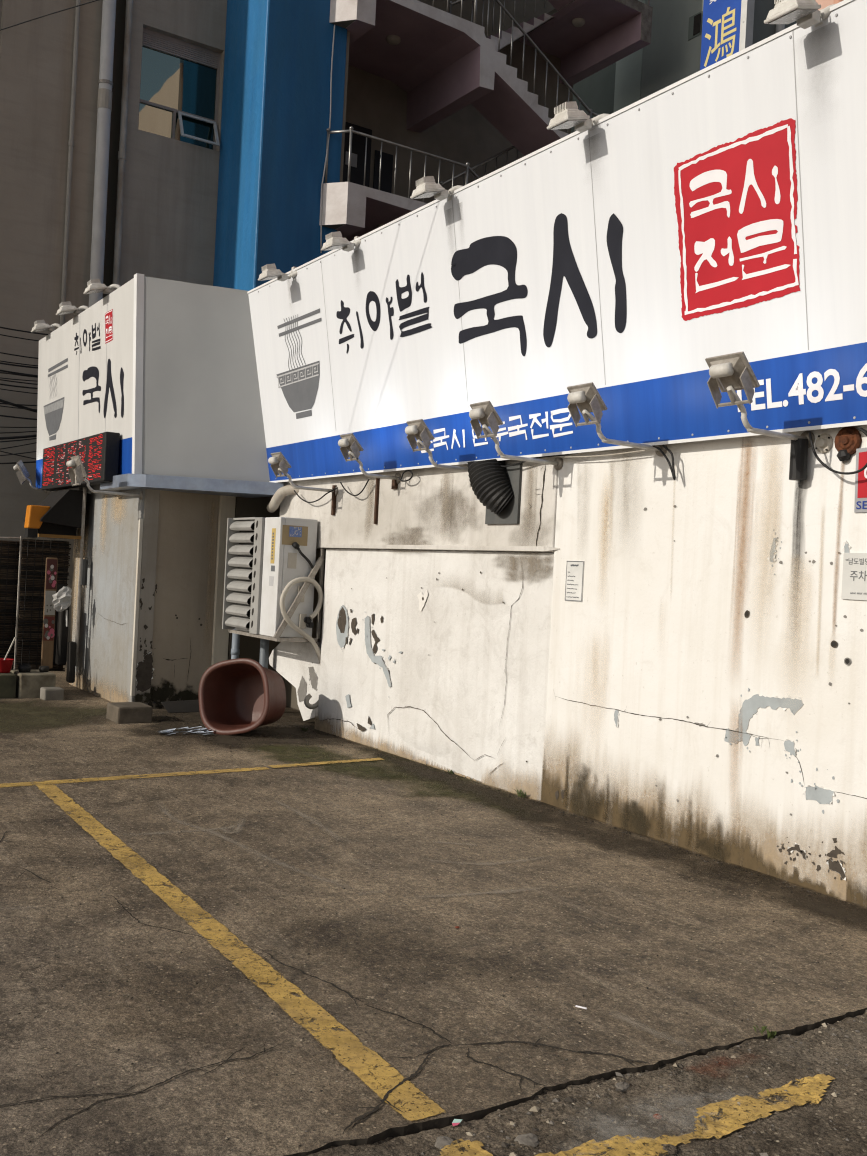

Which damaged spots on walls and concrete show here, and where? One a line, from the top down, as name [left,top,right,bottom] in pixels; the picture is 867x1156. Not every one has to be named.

rust [740,451,749,594]
spalling [135,625,154,692]
peeling [336,605,402,698]
crack [387,470,545,773]
damp [69,673,867,926]
crack [554,693,804,781]
peeling [724,688,804,752]
peeling [784,731,839,814]
spalling [777,837,846,880]